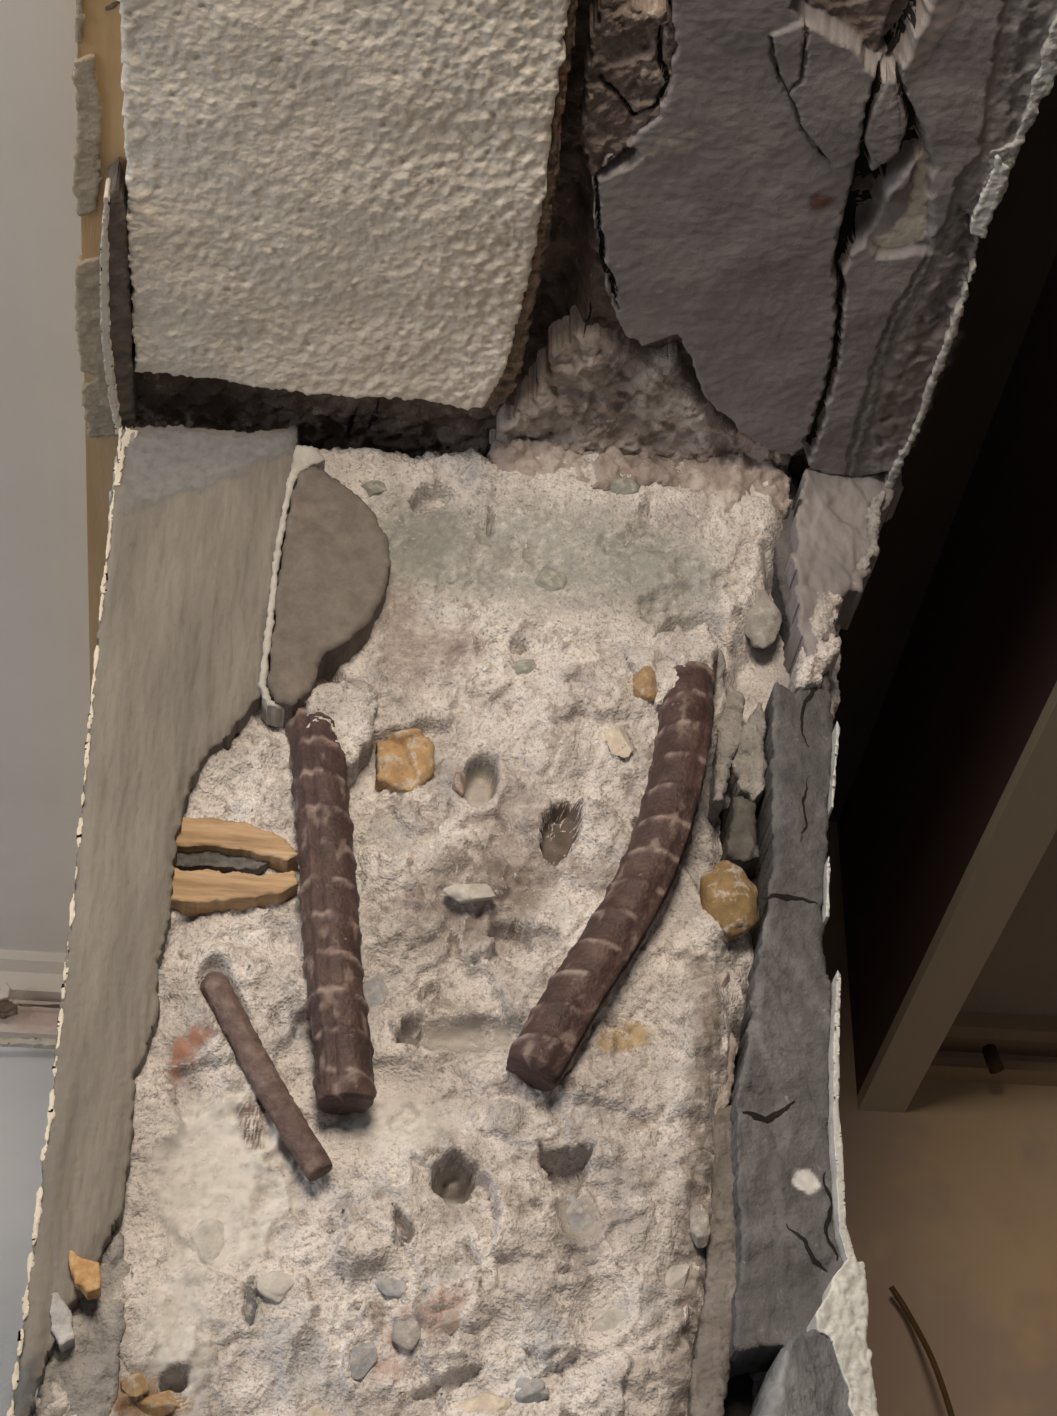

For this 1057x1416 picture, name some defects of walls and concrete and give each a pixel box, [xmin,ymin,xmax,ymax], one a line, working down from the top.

crack [771,0,919,446]
spalling [0,0,810,1416]
peeling [821,856,831,925]
peeling [826,624,841,819]
rust [238,1102,267,1148]
peeling [806,970,879,1416]